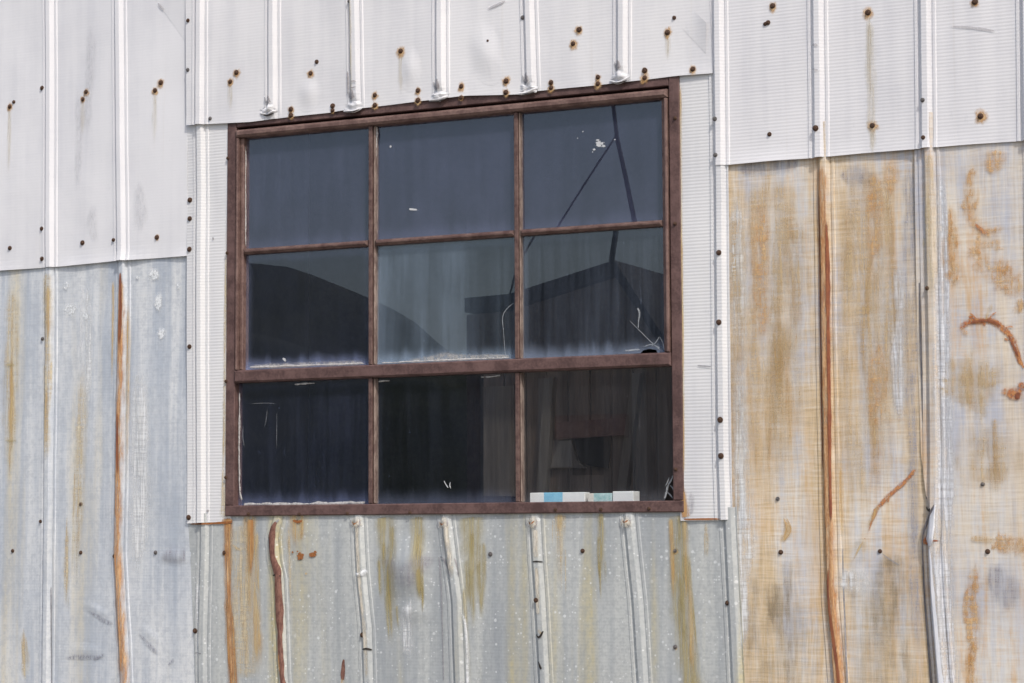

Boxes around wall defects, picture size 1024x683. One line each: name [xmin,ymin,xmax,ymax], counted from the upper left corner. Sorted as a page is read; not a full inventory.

rust [961,172,1023,312]
rust [6,297,16,465]
rust [44,276,52,451]
rust [960,312,1024,368]
rust [983,365,1024,399]
rust [112,273,129,683]
rust [191,473,317,683]
rust [378,517,398,633]
rust [413,517,423,601]
rust [857,470,915,553]
rust [964,576,979,681]